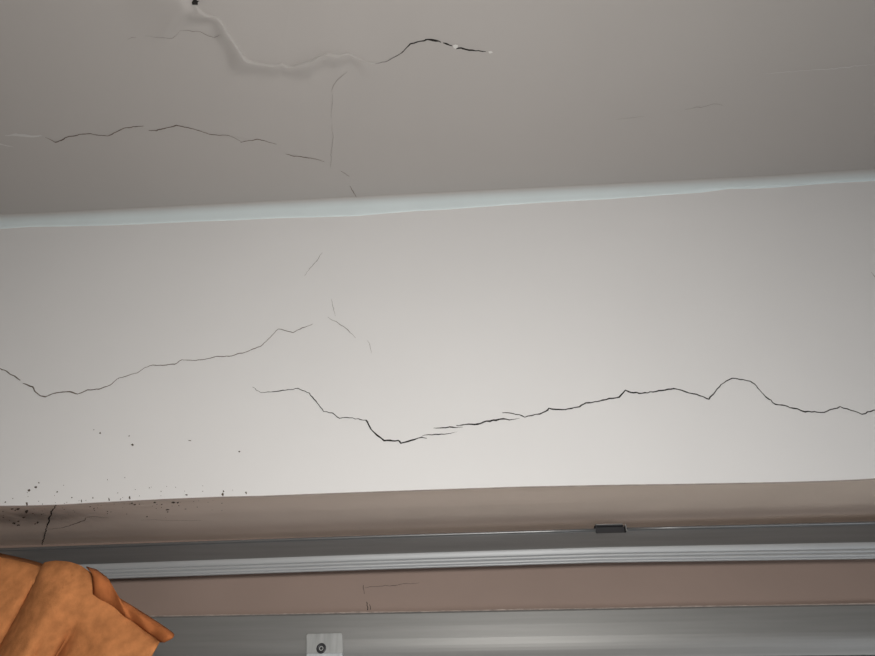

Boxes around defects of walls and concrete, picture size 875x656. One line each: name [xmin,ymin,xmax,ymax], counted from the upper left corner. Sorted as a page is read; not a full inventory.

crack [377,39,486,64]
crack [45,125,356,196]
crack [0,299,371,397]
crack [253,378,875,444]
crack [41,505,95,545]